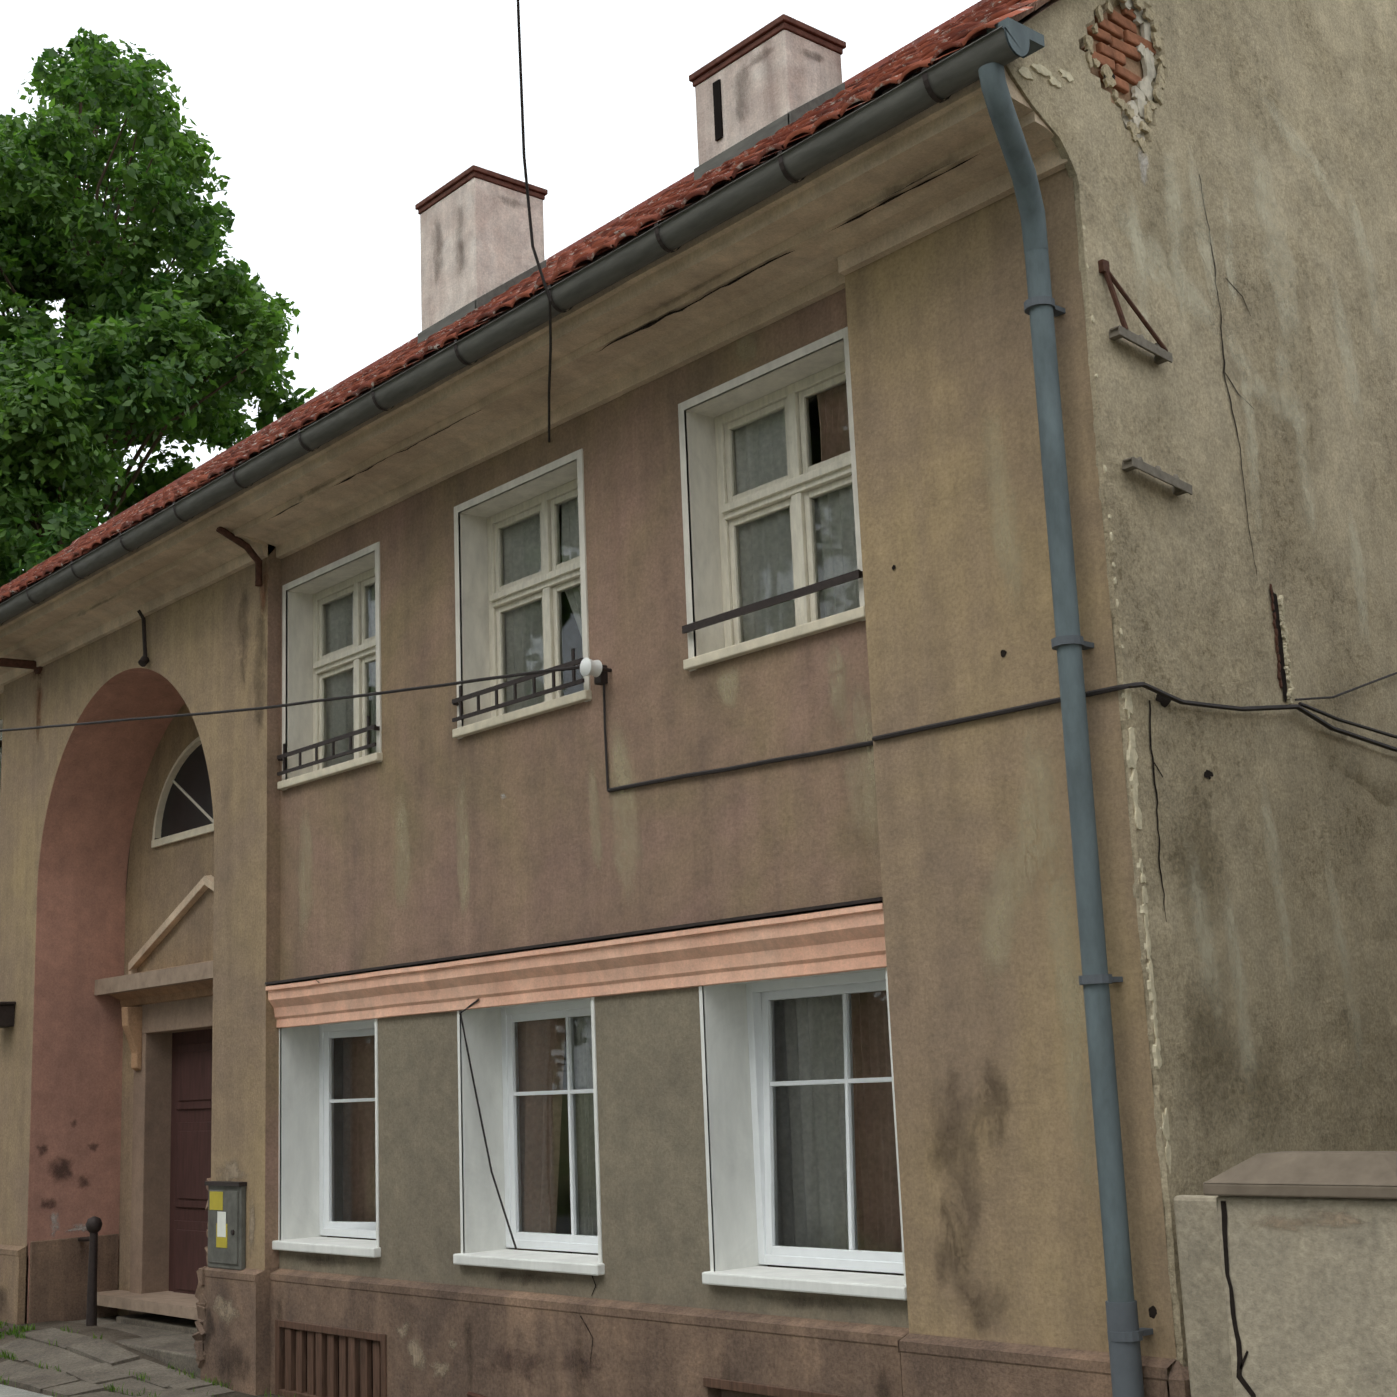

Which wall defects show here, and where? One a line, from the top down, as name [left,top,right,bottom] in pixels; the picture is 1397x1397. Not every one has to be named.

flaking render [1080,0,1166,181]
crack [829,155,977,232]
crack [598,250,795,352]
crack [1199,174,1257,573]
flaking render [1269,584,1295,704]
spalling [1122,683,1142,830]
spalling [1137,858,1162,1069]
spalling [1160,1108,1171,1174]
crack [1221,1201,1256,1397]